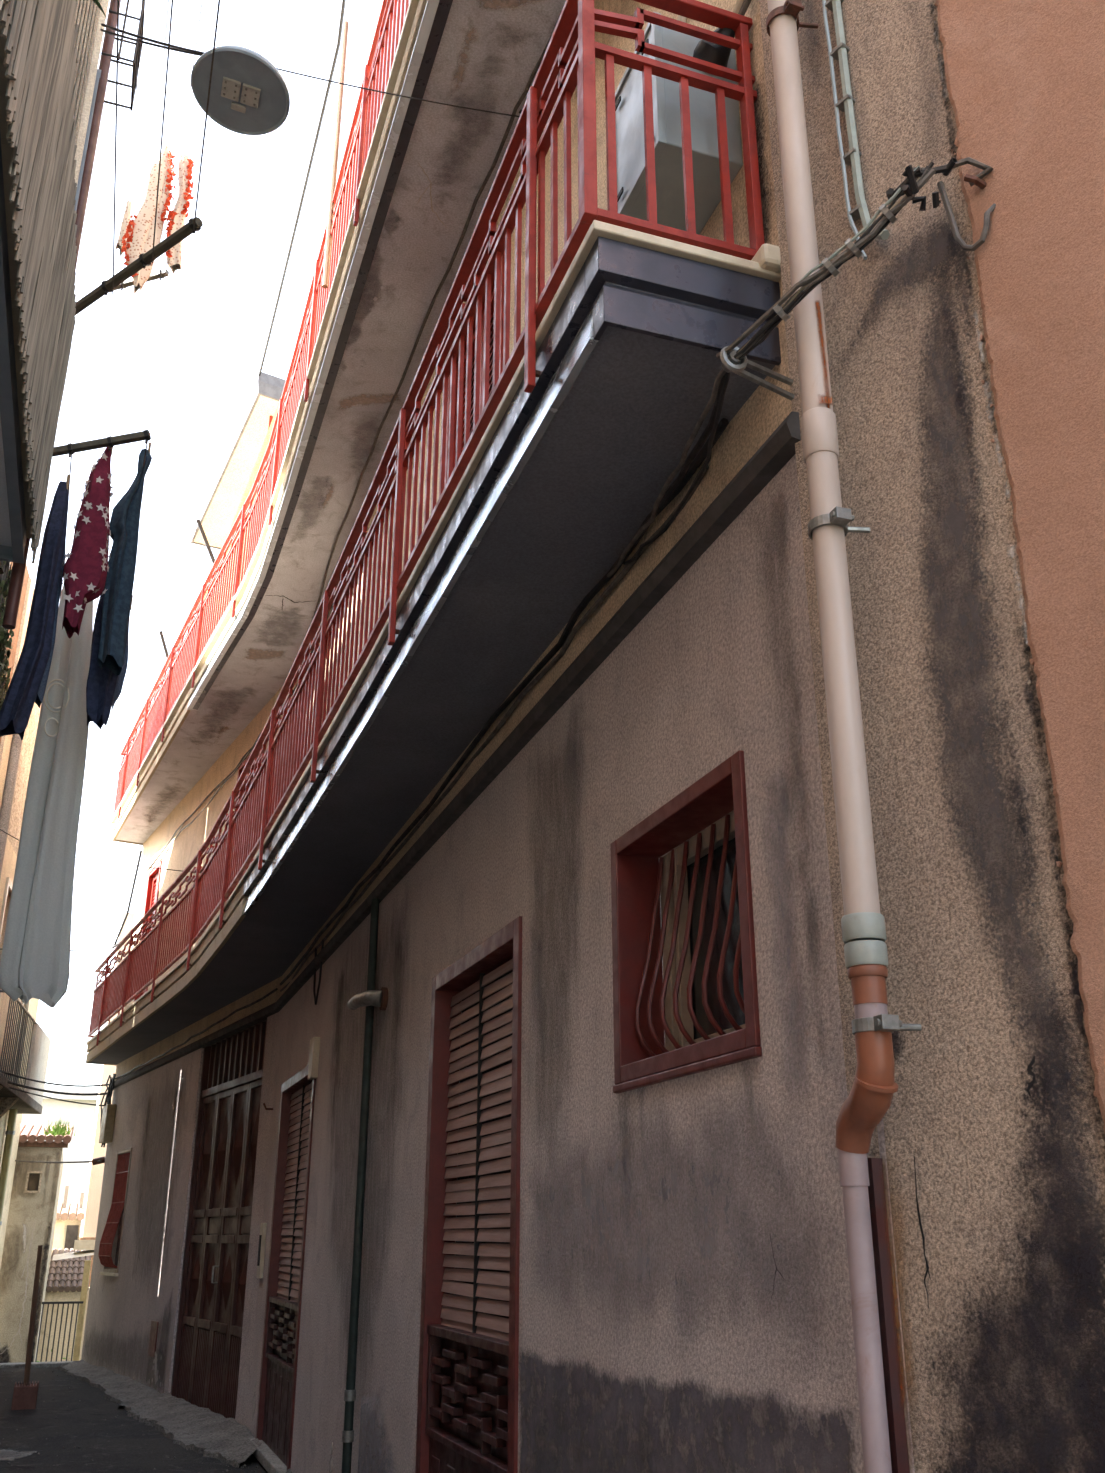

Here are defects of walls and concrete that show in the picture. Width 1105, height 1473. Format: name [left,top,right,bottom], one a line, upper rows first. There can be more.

water stain [519,1354,854,1473]
water stain [914,231,1105,1473]